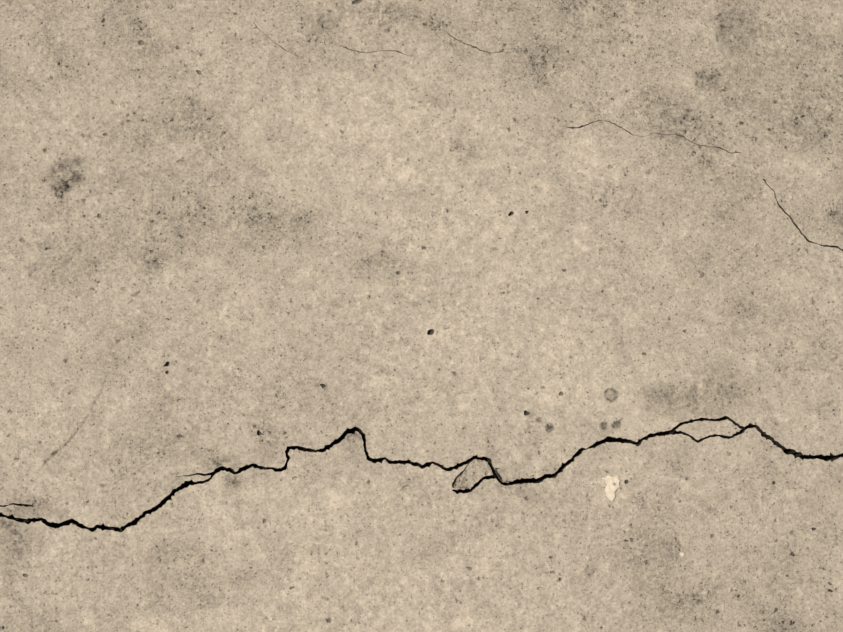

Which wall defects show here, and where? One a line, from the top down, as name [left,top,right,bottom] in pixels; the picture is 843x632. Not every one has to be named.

crack [763,179,843,251]
crack [0,416,843,532]